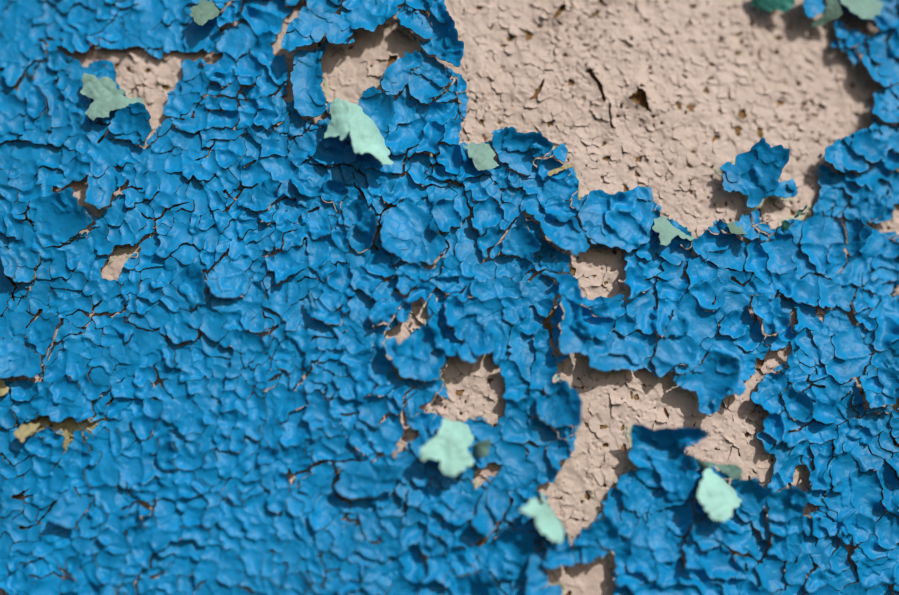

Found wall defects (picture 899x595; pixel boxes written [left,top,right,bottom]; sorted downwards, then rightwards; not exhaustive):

peeling [37,0,269,149]
crack [587,68,616,129]
peeling [0,154,165,302]
crack [353,174,398,251]
crack [443,180,474,224]
peeling [171,262,250,305]
peeling [269,0,899,595]
crack [10,303,195,383]
crack [13,486,77,529]
peeling [48,486,94,529]
crack [288,456,384,544]
peeling [103,574,124,595]